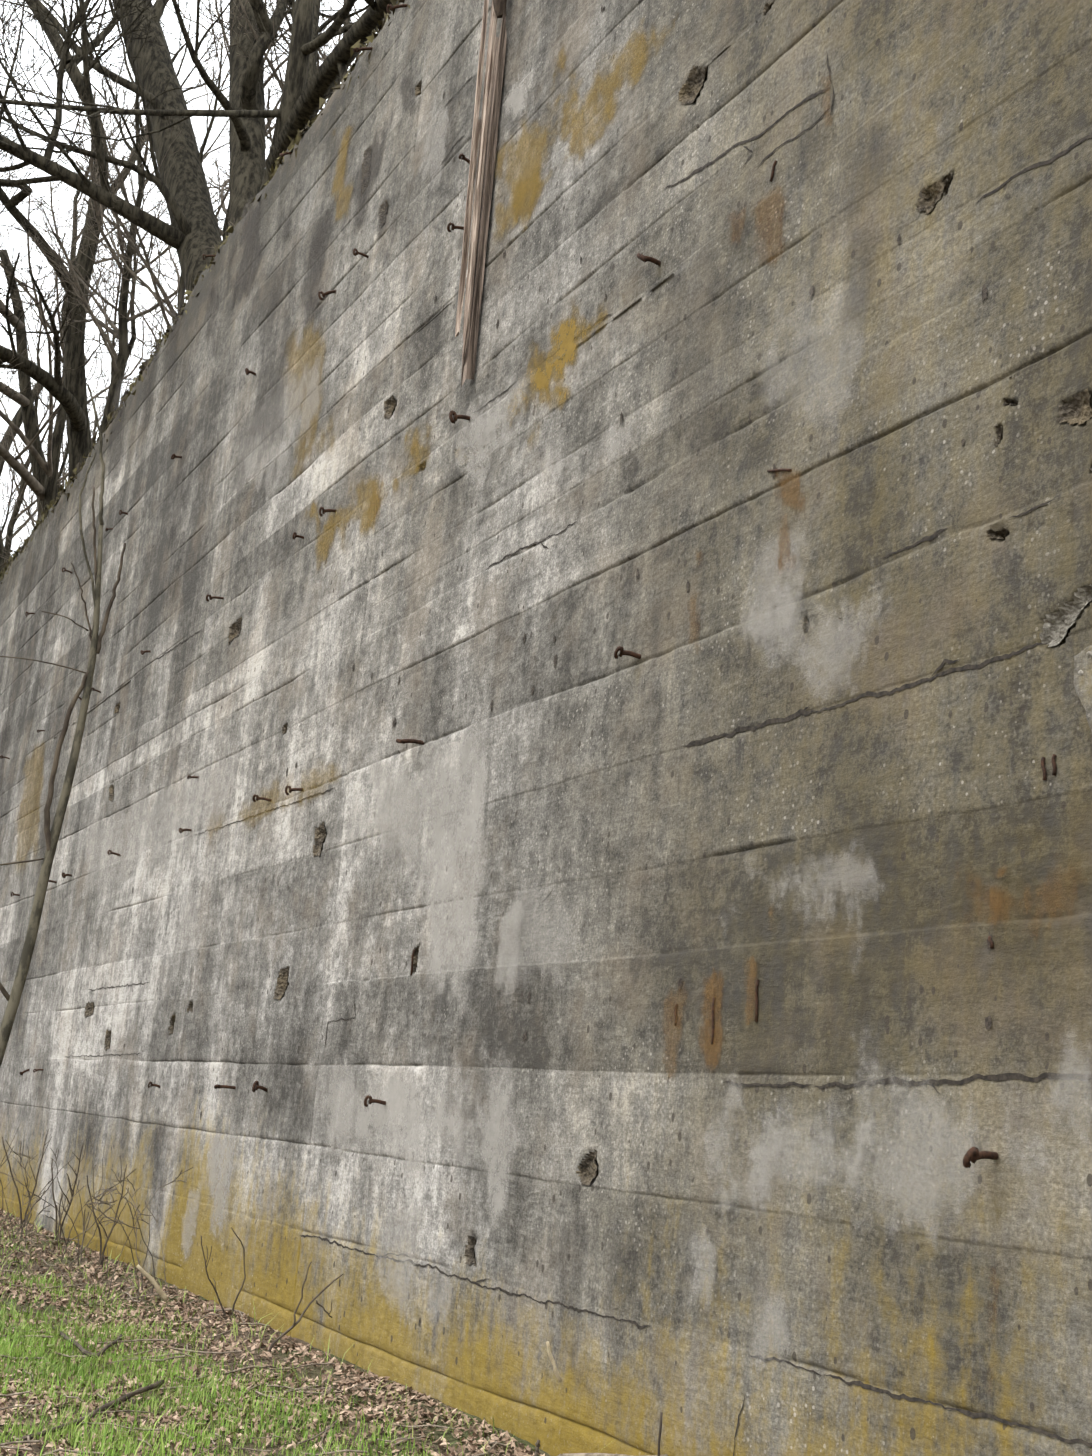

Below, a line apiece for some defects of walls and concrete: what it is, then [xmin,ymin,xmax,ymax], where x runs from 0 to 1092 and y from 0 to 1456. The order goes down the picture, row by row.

damp [506,85,526,116]
crack [666,55,834,188]
spalling [1040,584,1092,647]
spalling [1074,645,1092,732]
crack [723,1072,1092,1094]
spalling [576,1149,598,1186]
crack [300,1235,651,1329]
crack [733,1395,745,1456]
crack [750,1355,1092,1447]